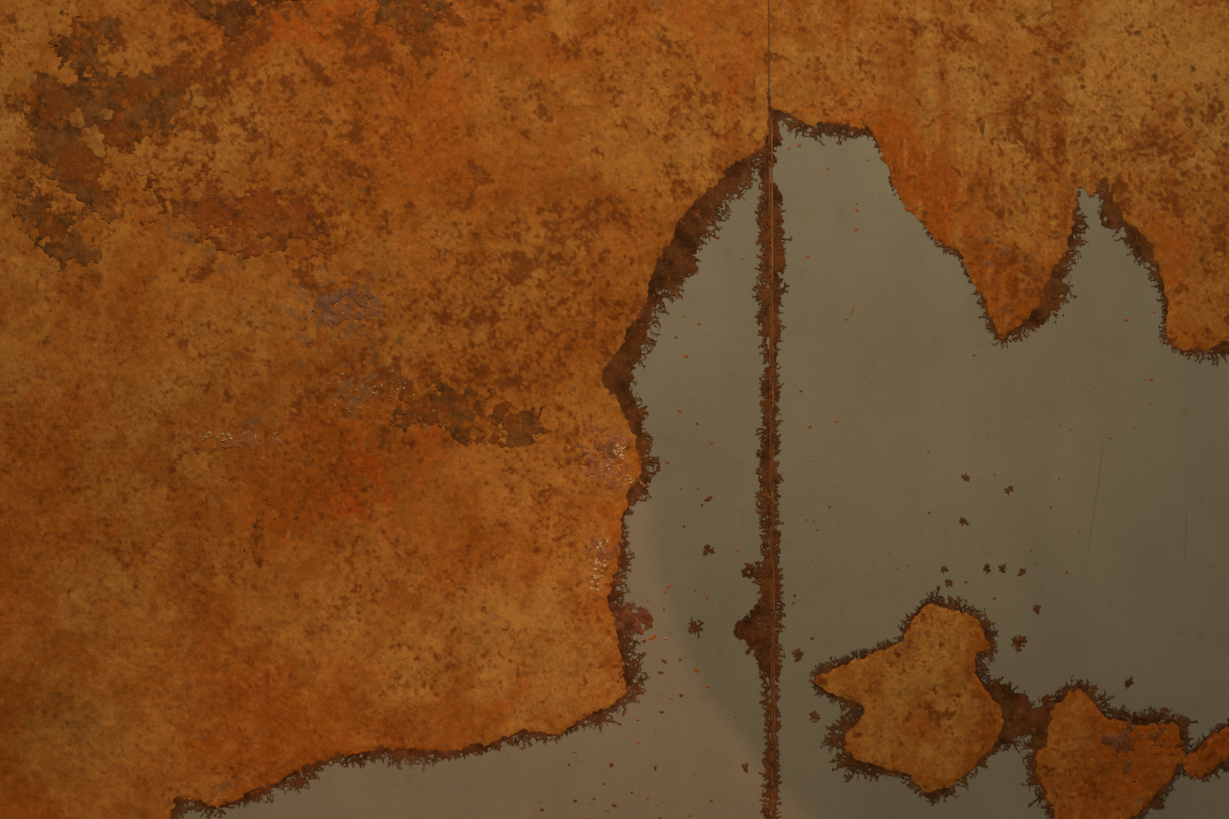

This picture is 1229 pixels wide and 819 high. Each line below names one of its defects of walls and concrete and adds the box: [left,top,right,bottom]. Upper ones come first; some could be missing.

peeling [239,497,276,568]
corrosion [0,0,771,819]
peeling [374,362,552,453]
corrosion [733,0,1229,819]